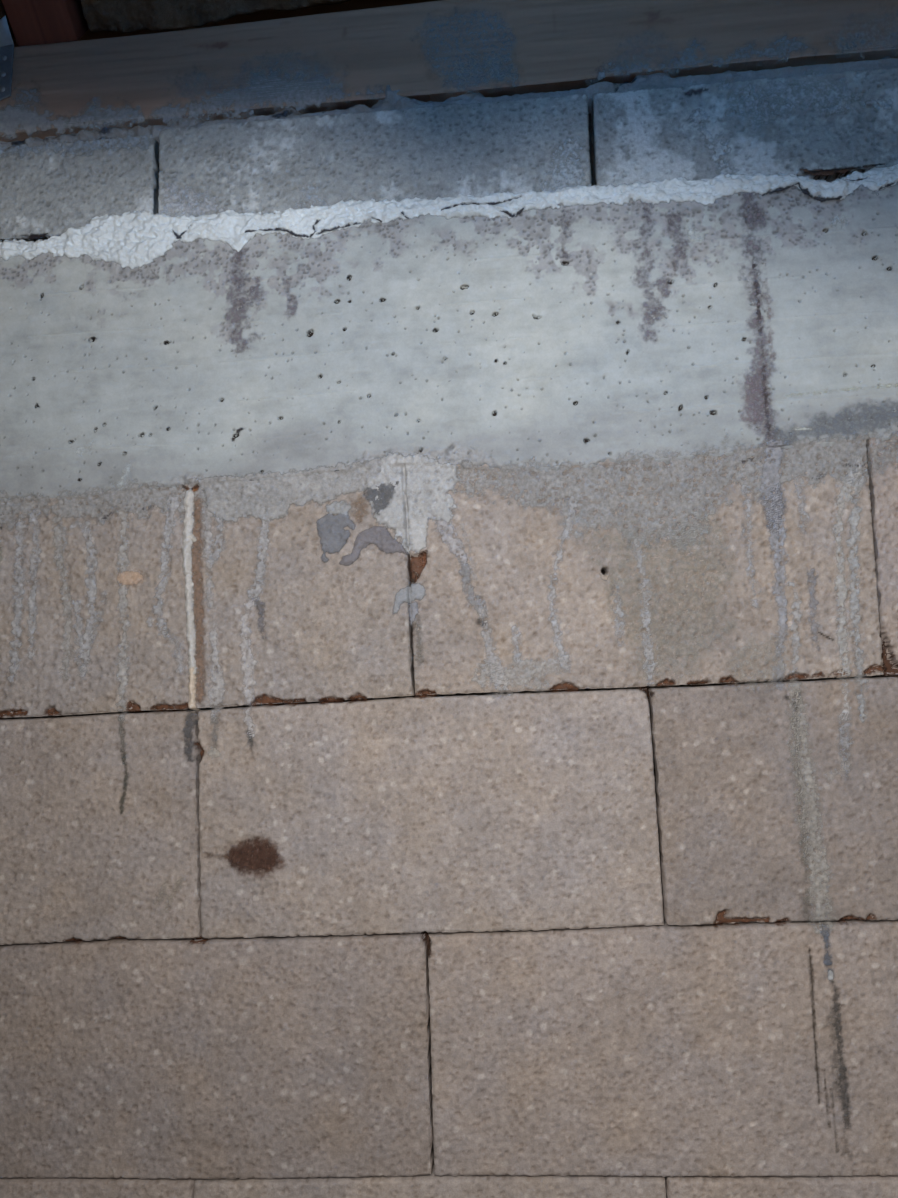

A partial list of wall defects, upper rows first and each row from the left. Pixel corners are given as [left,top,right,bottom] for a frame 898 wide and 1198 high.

crack [245,211,409,238]
crack [441,196,524,217]
peeling [340,498,429,583]
leakage [0,458,383,814]
leakage [434,192,898,1125]